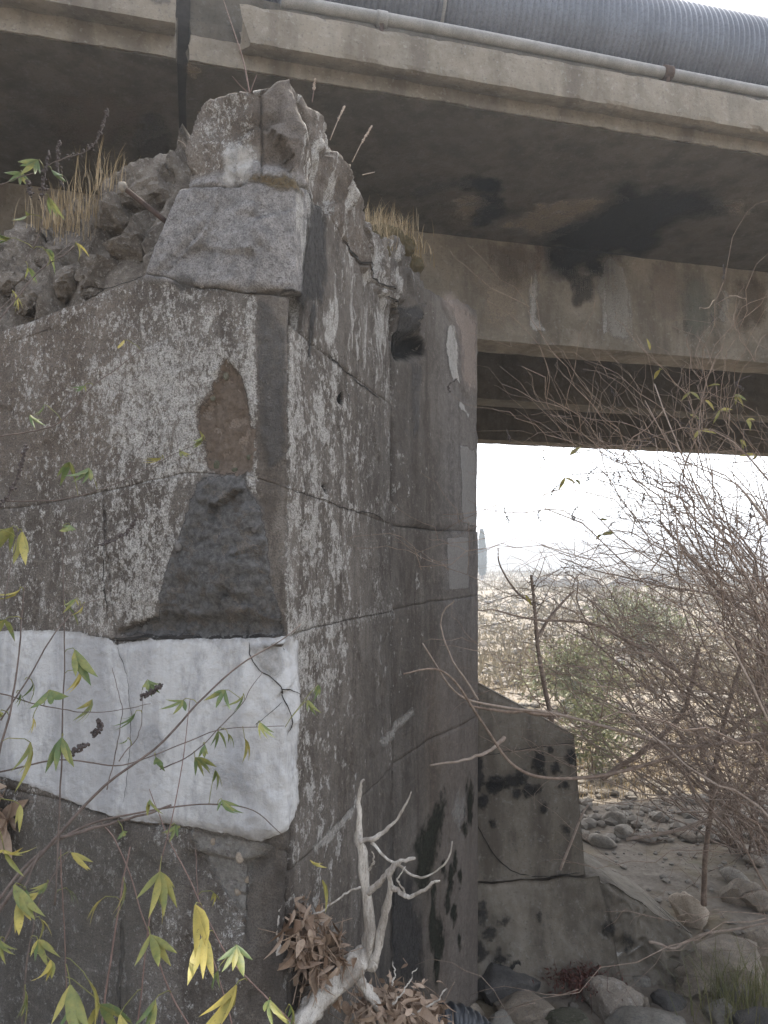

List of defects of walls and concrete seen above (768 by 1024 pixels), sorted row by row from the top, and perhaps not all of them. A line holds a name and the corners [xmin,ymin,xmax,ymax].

leakage [480,183,722,339]
crack [330,355,379,403]
crack [293,490,451,532]
peeling [0,358,301,913]
leakage [453,747,578,827]
crack [478,827,575,878]
leakage [392,869,444,986]